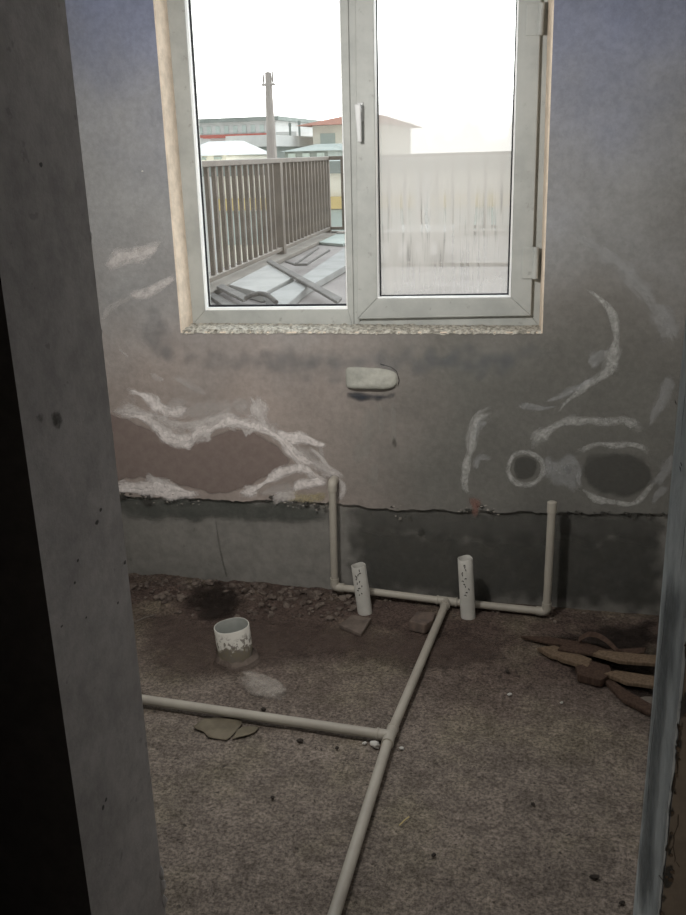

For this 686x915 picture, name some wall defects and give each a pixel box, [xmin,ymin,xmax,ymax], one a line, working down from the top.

damp [563,292,619,406]
damp [462,415,484,489]
damp [534,418,635,441]
flaking render [119,492,200,506]